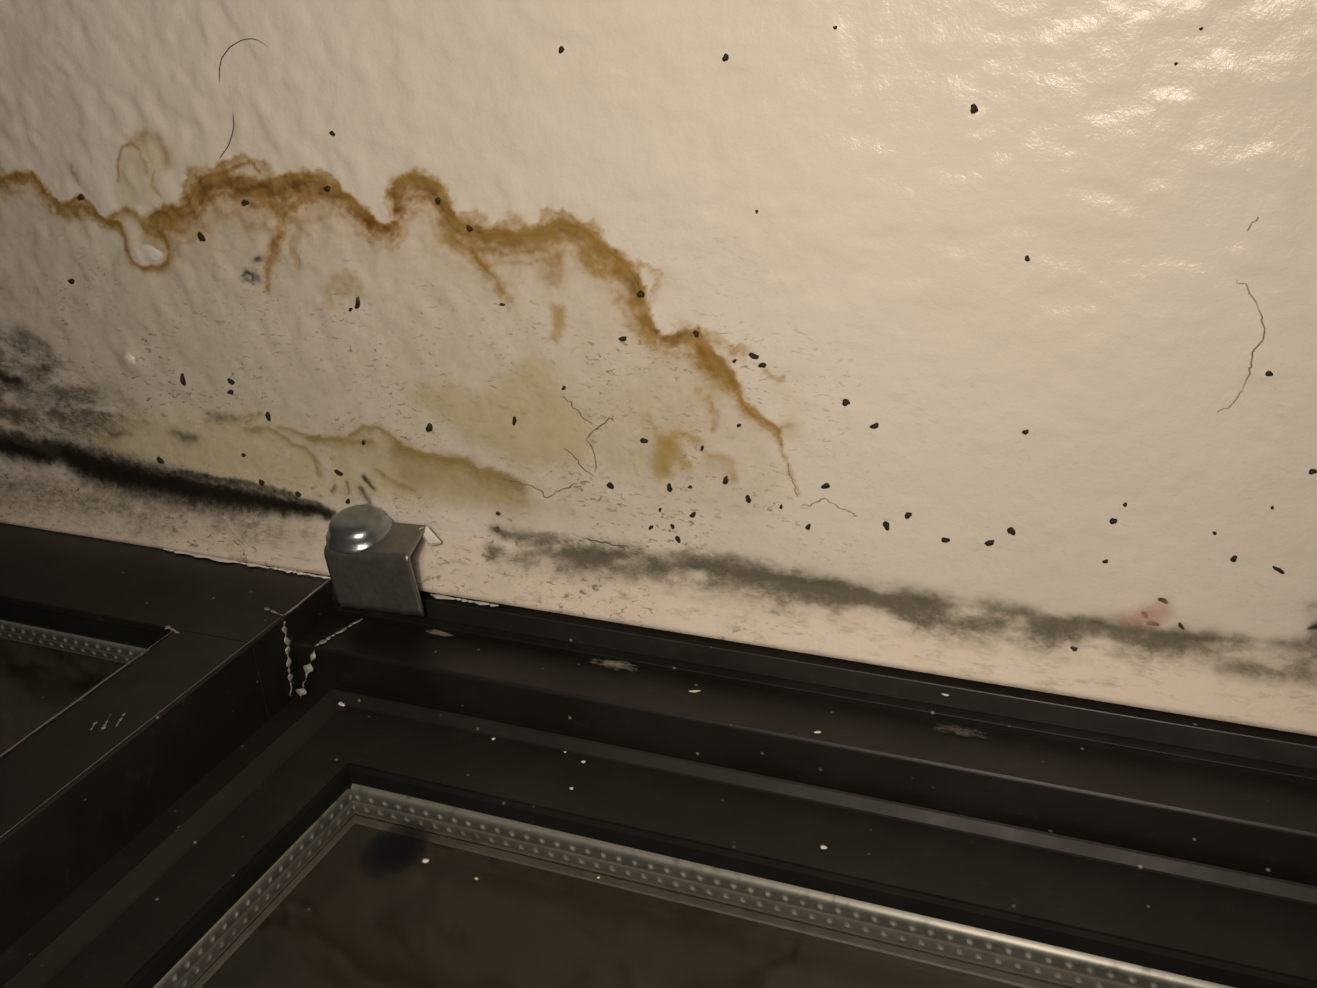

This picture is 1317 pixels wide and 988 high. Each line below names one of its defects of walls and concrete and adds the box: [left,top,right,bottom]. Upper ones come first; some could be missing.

damp [0,156,782,445]
crack [1217,280,1265,412]
damp [0,338,335,527]
damp [304,425,523,490]
damp [423,369,585,460]
damp [488,527,1215,651]